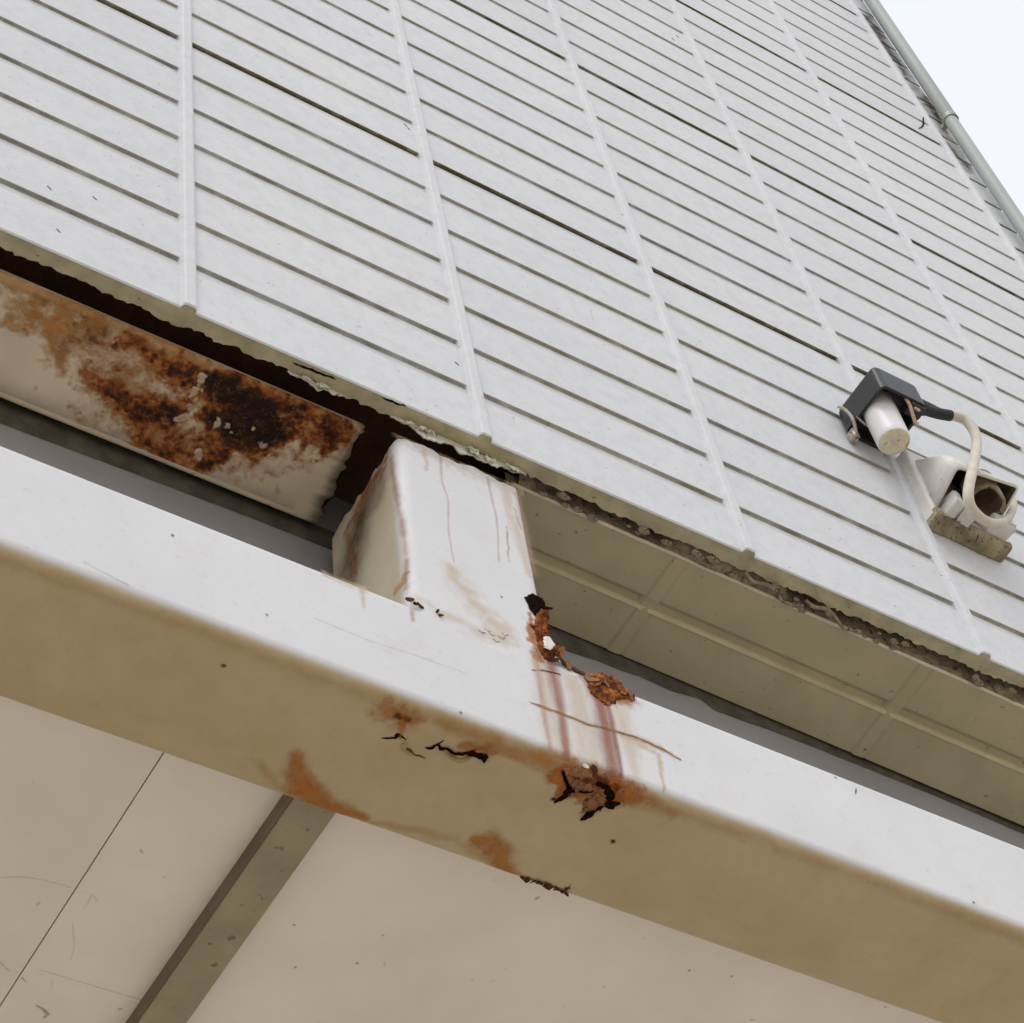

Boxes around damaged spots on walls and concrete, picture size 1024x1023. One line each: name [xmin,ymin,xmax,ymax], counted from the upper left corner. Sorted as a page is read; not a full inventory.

rust [0,272,357,476]
peeling [530,623,572,671]
crack [381,733,489,764]
rust [488,662,635,779]
rust [289,755,367,821]
rust [472,837,514,874]